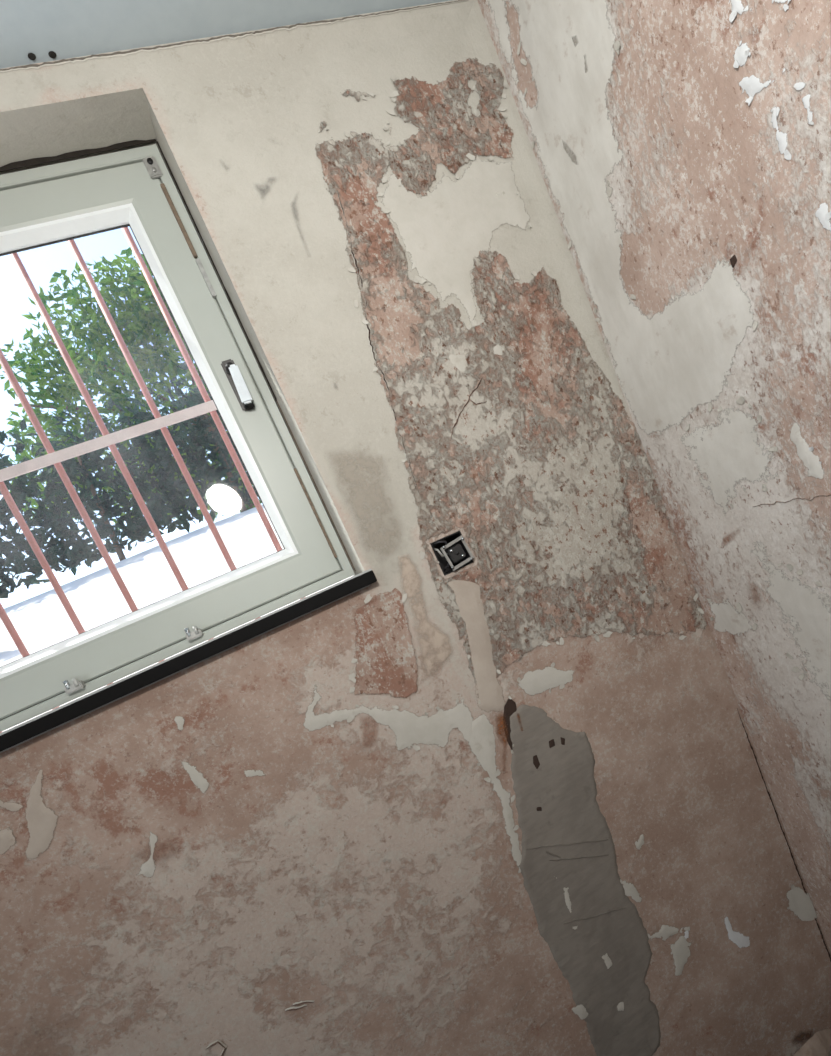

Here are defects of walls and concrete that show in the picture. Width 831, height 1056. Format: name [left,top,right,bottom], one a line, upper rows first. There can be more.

peeling [733,40,785,106]
peeling [794,82,814,125]
peeling [771,107,792,160]
peeling [815,202,831,231]
spalling [315,0,758,709]
peeling [790,423,824,480]
spalling [503,695,517,754]
peeling [620,879,642,902]
peeling [571,1004,588,1020]